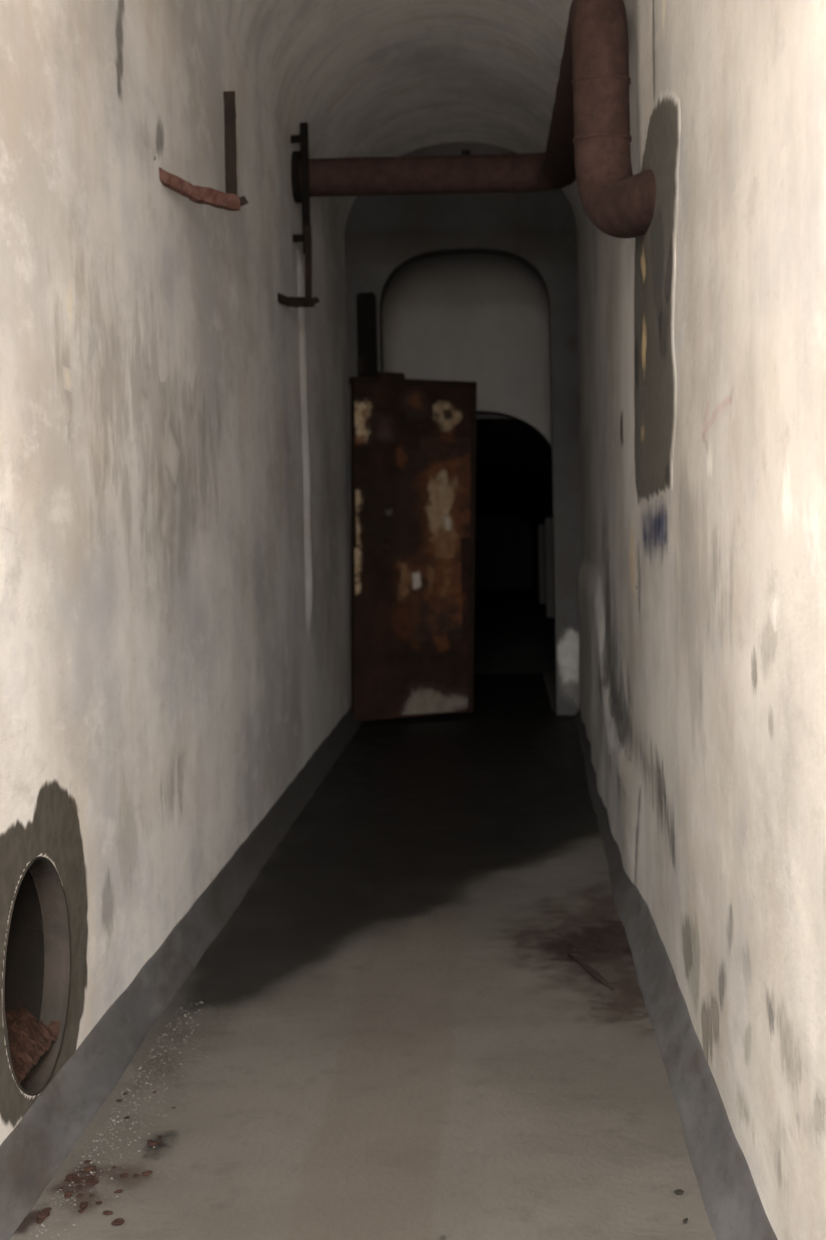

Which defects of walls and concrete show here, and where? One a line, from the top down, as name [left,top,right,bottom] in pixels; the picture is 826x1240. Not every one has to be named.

peeling [613,86,682,506]
rust [396,437,471,641]
peeling [0,773,89,1133]
damp [144,673,604,1039]